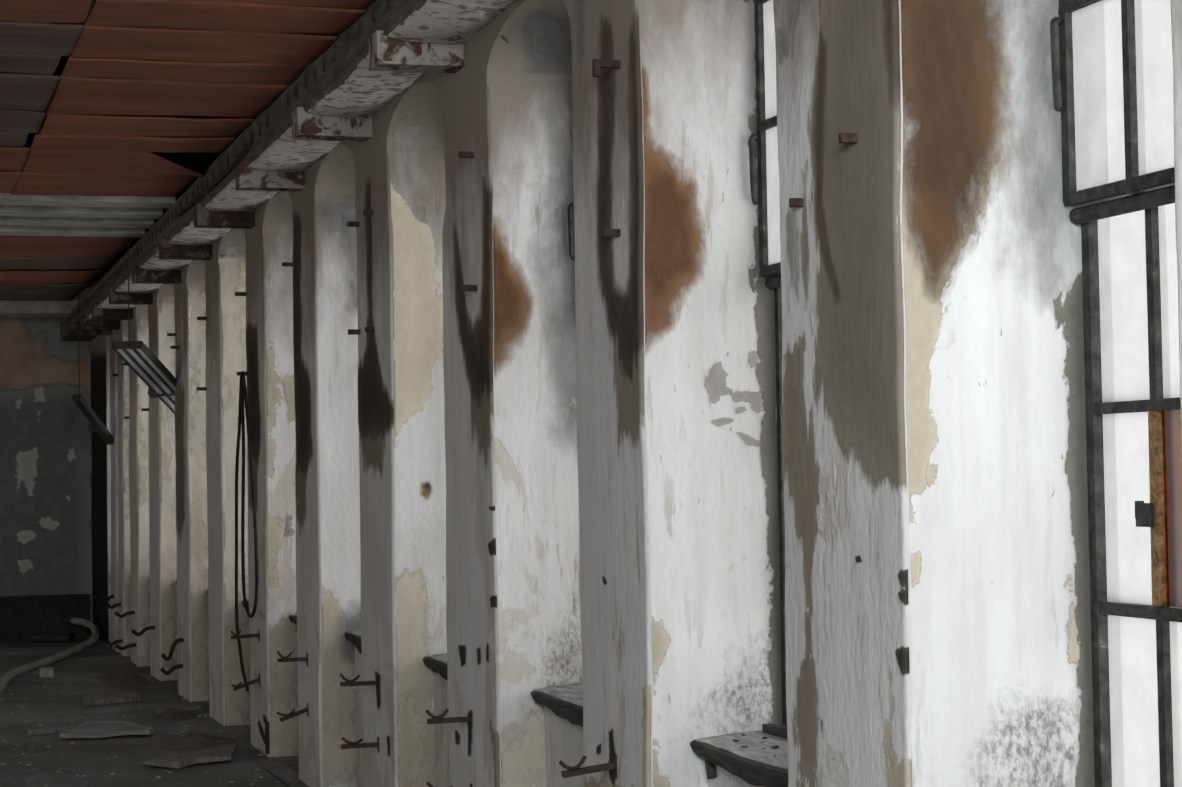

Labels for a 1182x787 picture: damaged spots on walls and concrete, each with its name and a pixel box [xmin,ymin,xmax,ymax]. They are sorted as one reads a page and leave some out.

peeling [0,383,93,635]
water stain [324,182,394,476]
peeling [390,180,443,447]
water stain [454,181,494,464]
water stain [597,15,645,455]
peeling [705,38,824,787]
water stain [777,0,799,62]
water stain [786,0,907,489]
water stain [996,0,1056,220]
peeling [585,617,671,787]
water stain [1004,704,1073,787]